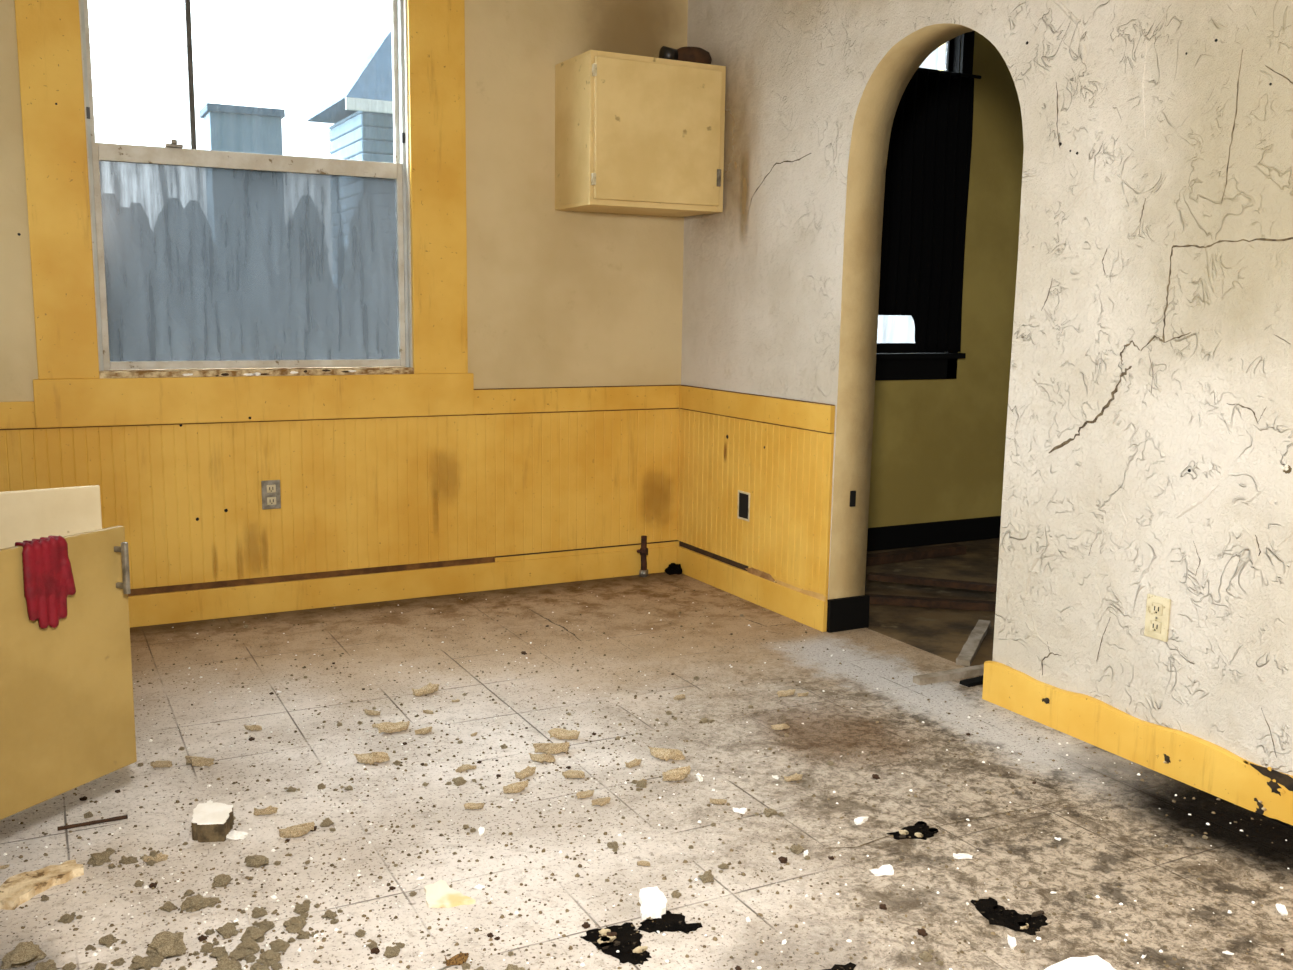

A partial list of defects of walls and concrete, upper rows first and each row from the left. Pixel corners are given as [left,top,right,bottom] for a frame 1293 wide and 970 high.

crack [1054,83,1062,147]
crack [1221,49,1293,204]
crack [748,153,811,212]
crack [1049,237,1293,453]
peeling [1243,760,1293,828]
peeling [596,929,648,953]
peeling [988,905,1044,929]